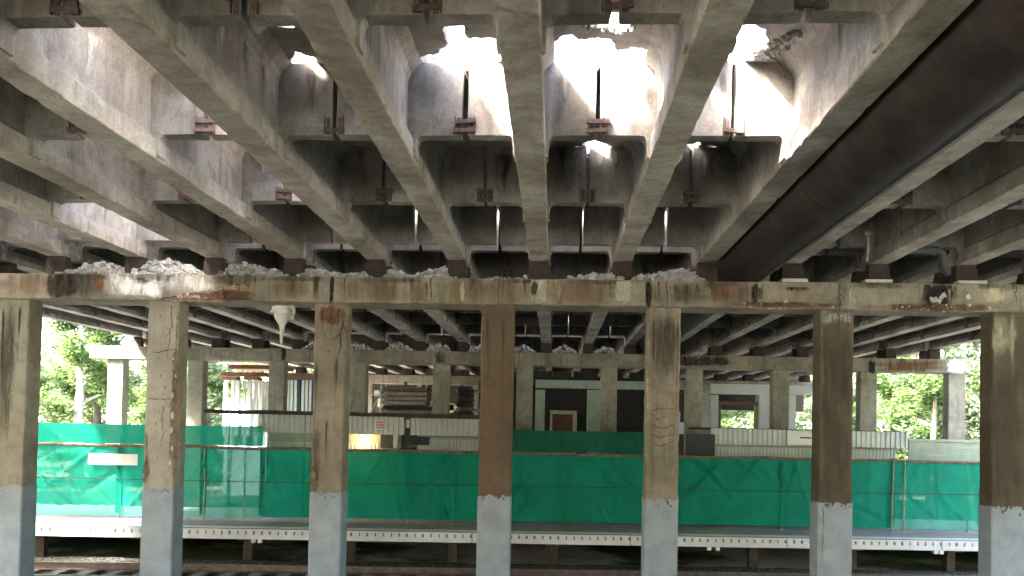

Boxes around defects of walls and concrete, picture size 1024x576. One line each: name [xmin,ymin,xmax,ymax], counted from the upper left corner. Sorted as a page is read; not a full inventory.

spalling [745,30,803,77]
spalling [164,285,257,303]
spalling [867,292,999,313]
crack [335,319,347,353]
crack [652,408,678,446]